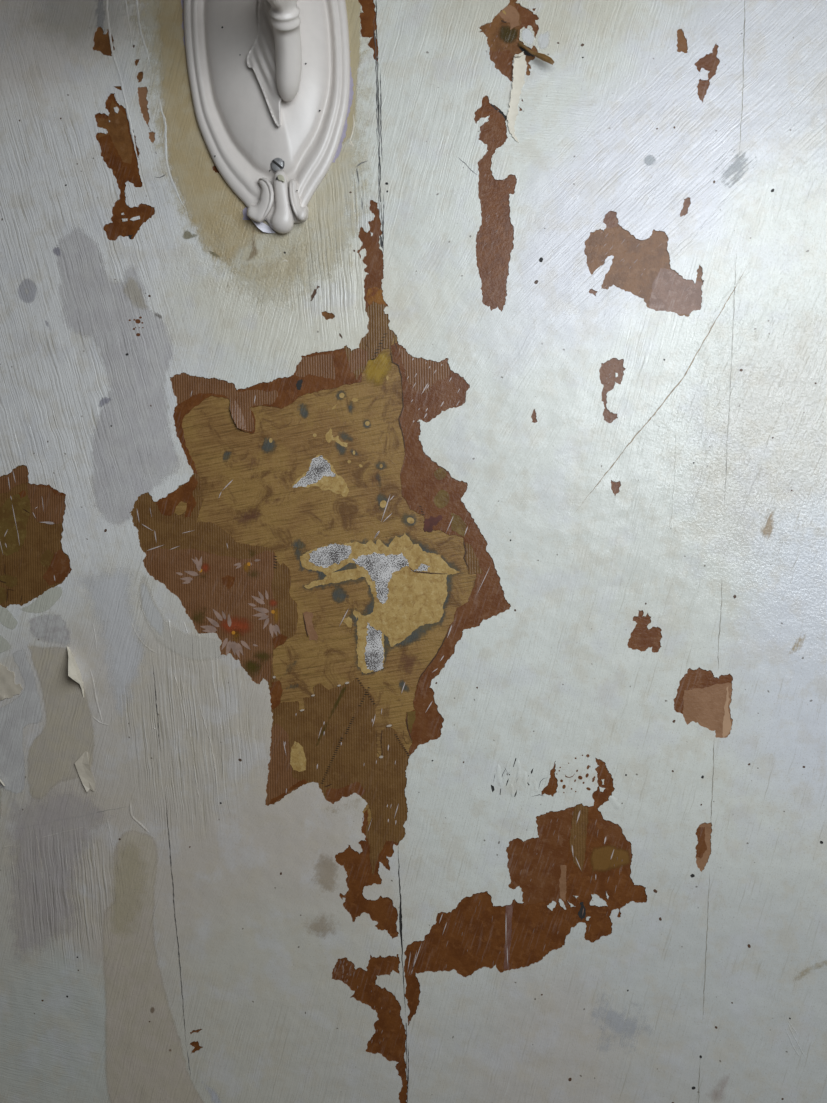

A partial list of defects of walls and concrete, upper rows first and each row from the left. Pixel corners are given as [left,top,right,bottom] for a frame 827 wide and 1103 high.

leakage [58,231,177,522]
peeling [95,87,155,241]
leakage [127,0,368,302]
crack [374,4,384,252]
peeling [474,0,554,312]
peeling [584,211,703,317]
peeling [0,465,72,653]
peeling [130,200,511,939]
peeling [673,667,733,738]
crack [167,817,185,1024]
crack [397,851,405,998]
peeling [332,754,647,1103]